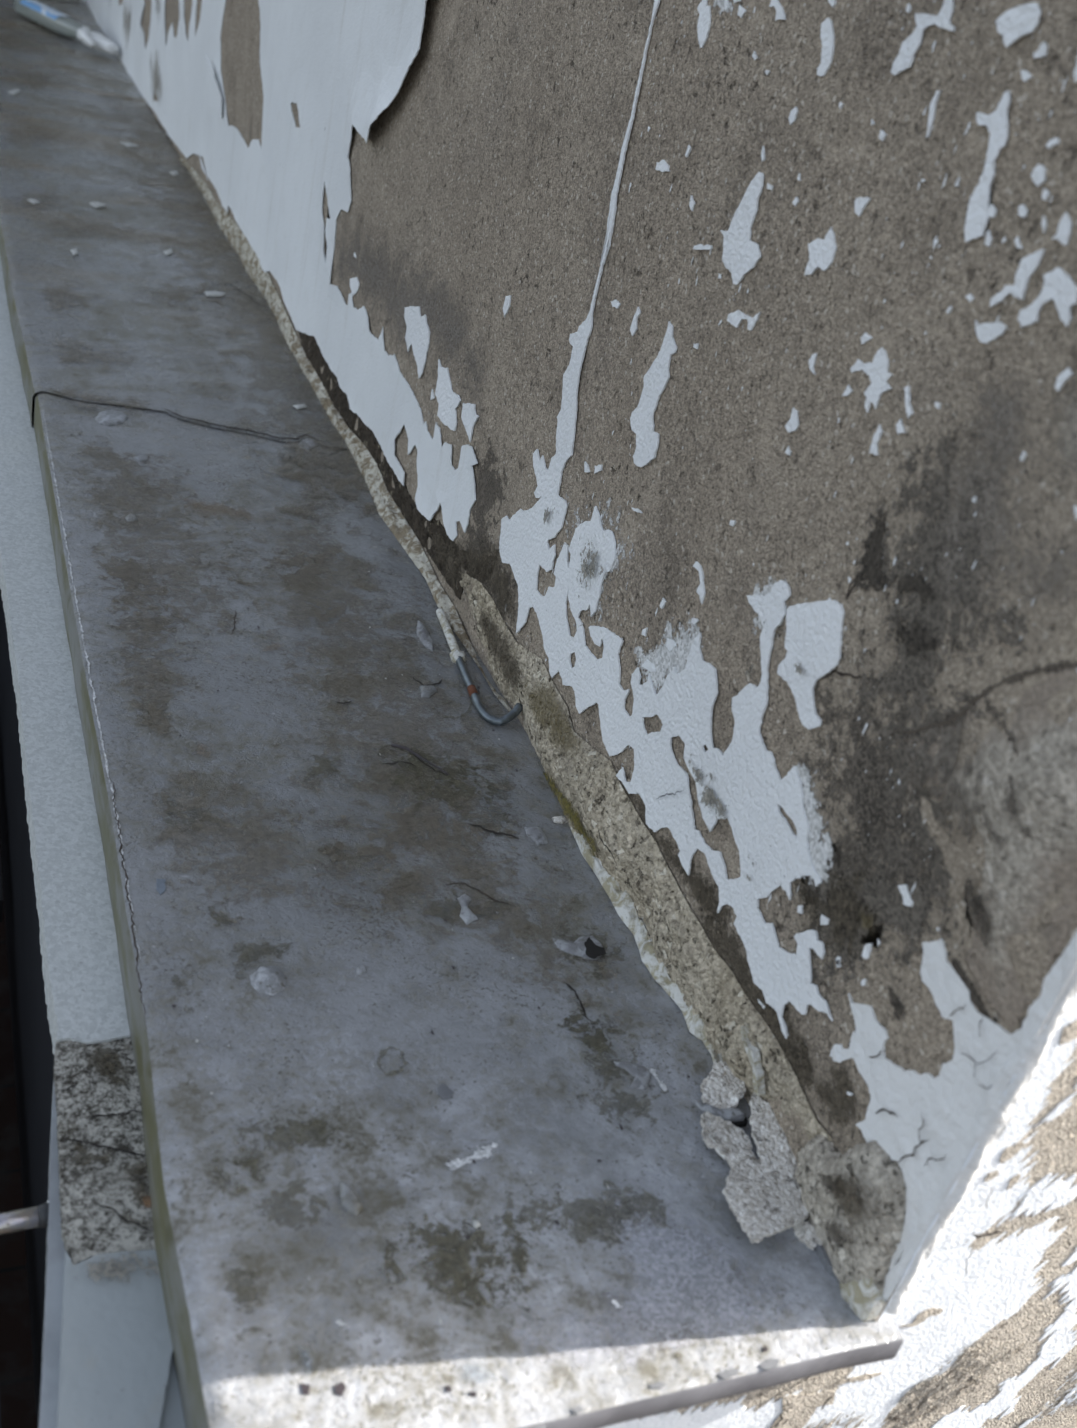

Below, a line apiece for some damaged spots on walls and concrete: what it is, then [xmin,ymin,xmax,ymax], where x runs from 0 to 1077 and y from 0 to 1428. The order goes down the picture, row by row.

peeling [142,0,202,47]
peeling [203,0,263,147]
peeling [291,103,300,128]
crack [164,408,326,444]
peeling [298,0,1077,1322]
water stain [794,395,1041,1023]
crack [820,659,1077,840]
peeling [751,1020,1077,1428]